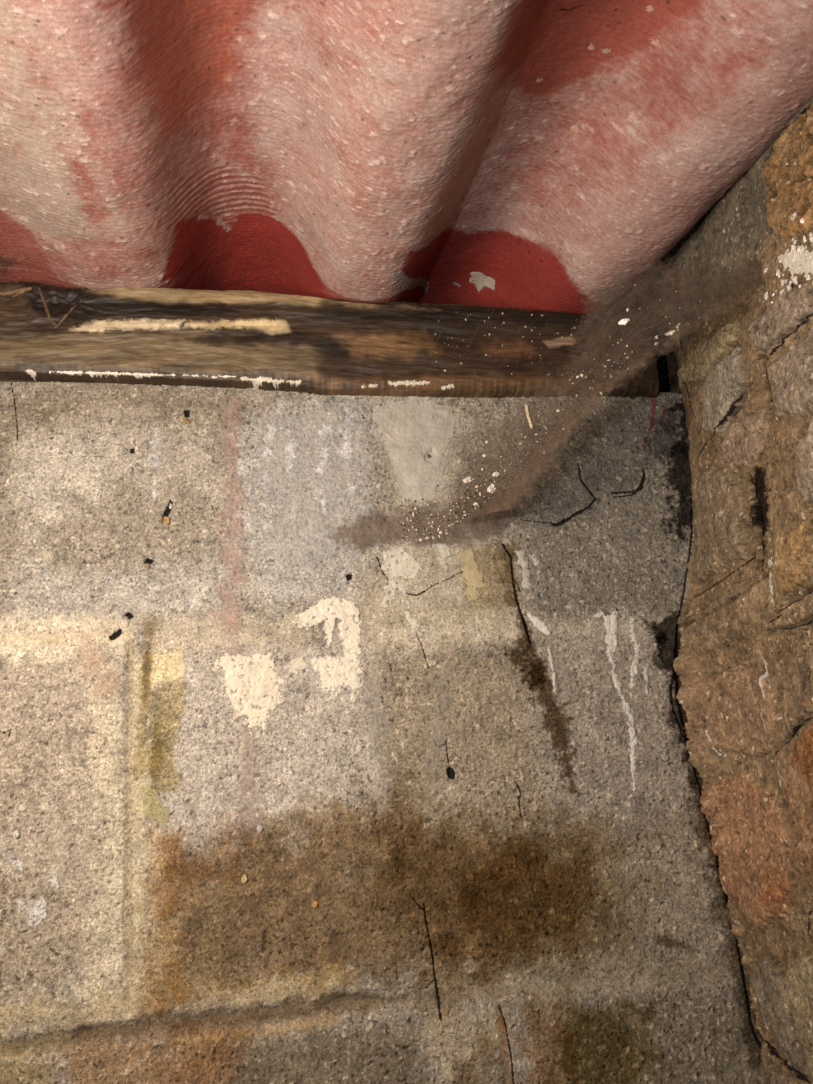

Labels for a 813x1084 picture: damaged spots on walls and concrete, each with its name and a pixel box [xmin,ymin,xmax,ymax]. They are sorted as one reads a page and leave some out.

leakage [75,319,289,334]
leakage [452,271,495,292]
crack [502,543,531,642]
leakage [515,551,539,589]
crack [520,463,646,526]
leakage [659,392,693,539]
crack [678,494,756,616]
peeling [212,542,422,774]
leakage [510,612,576,793]
leakage [594,608,698,793]
crack [410,893,442,1020]
crack [735,937,810,1083]